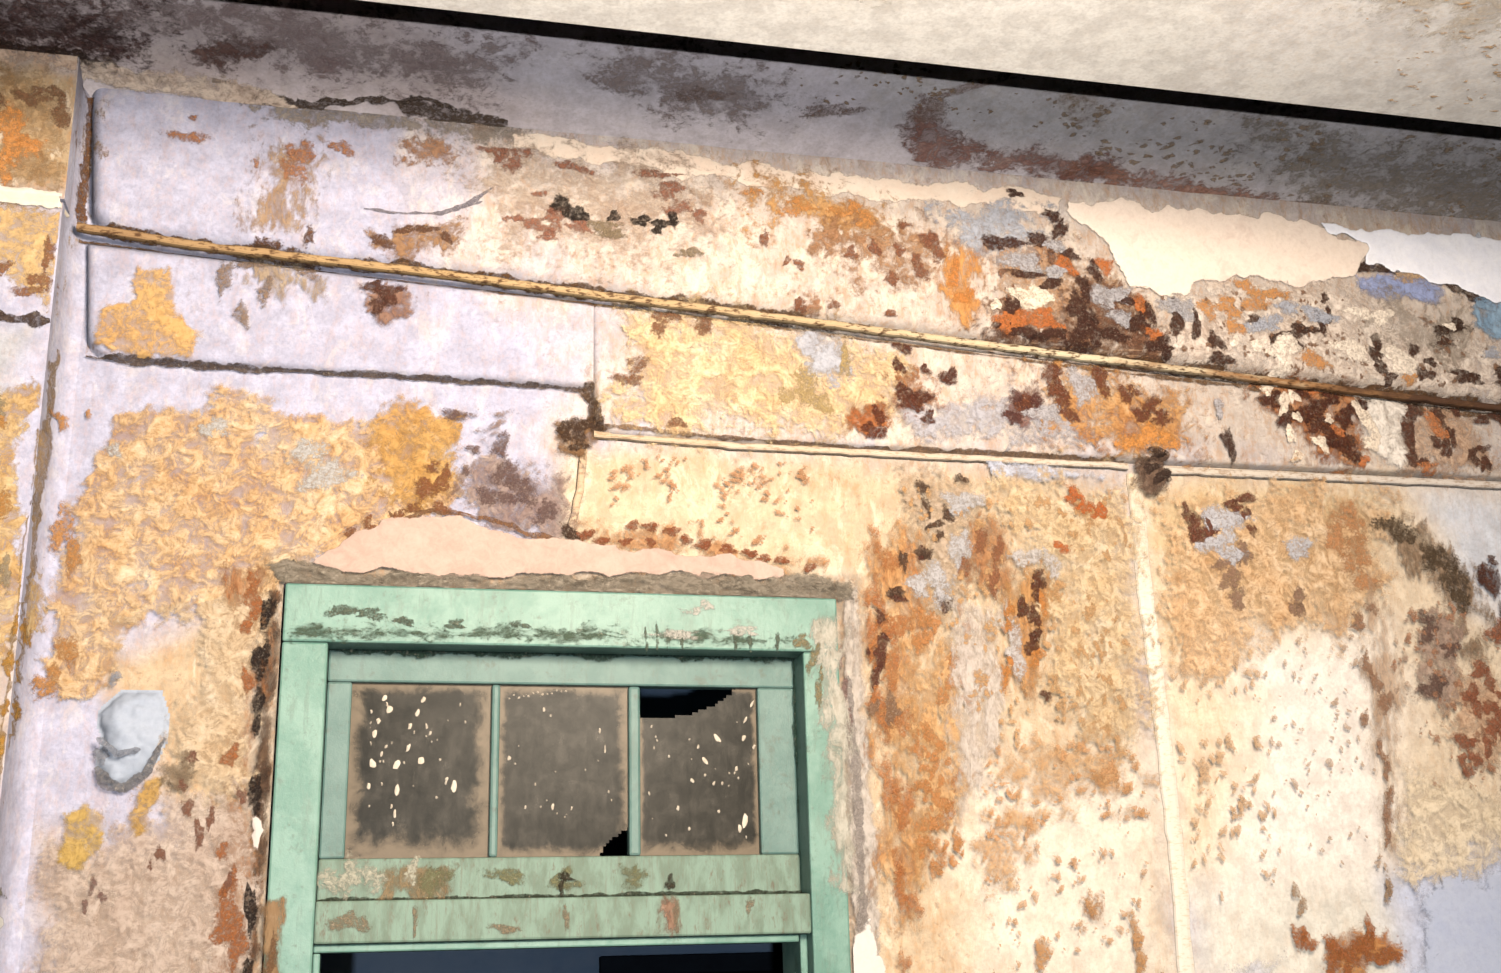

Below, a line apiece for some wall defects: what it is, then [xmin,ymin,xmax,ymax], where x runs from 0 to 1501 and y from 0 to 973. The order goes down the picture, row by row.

crack [86,353,1124,463]
crack [0,40,1501,420]
corrosion [845,343,958,439]
leakage [568,36,1501,222]
flaking render [972,197,1501,481]
peeling [0,376,784,973]
corrosion [857,511,1164,973]
peeling [886,463,1160,753]
corrosion [1001,357,1411,903]
corrosion [1291,882,1406,973]